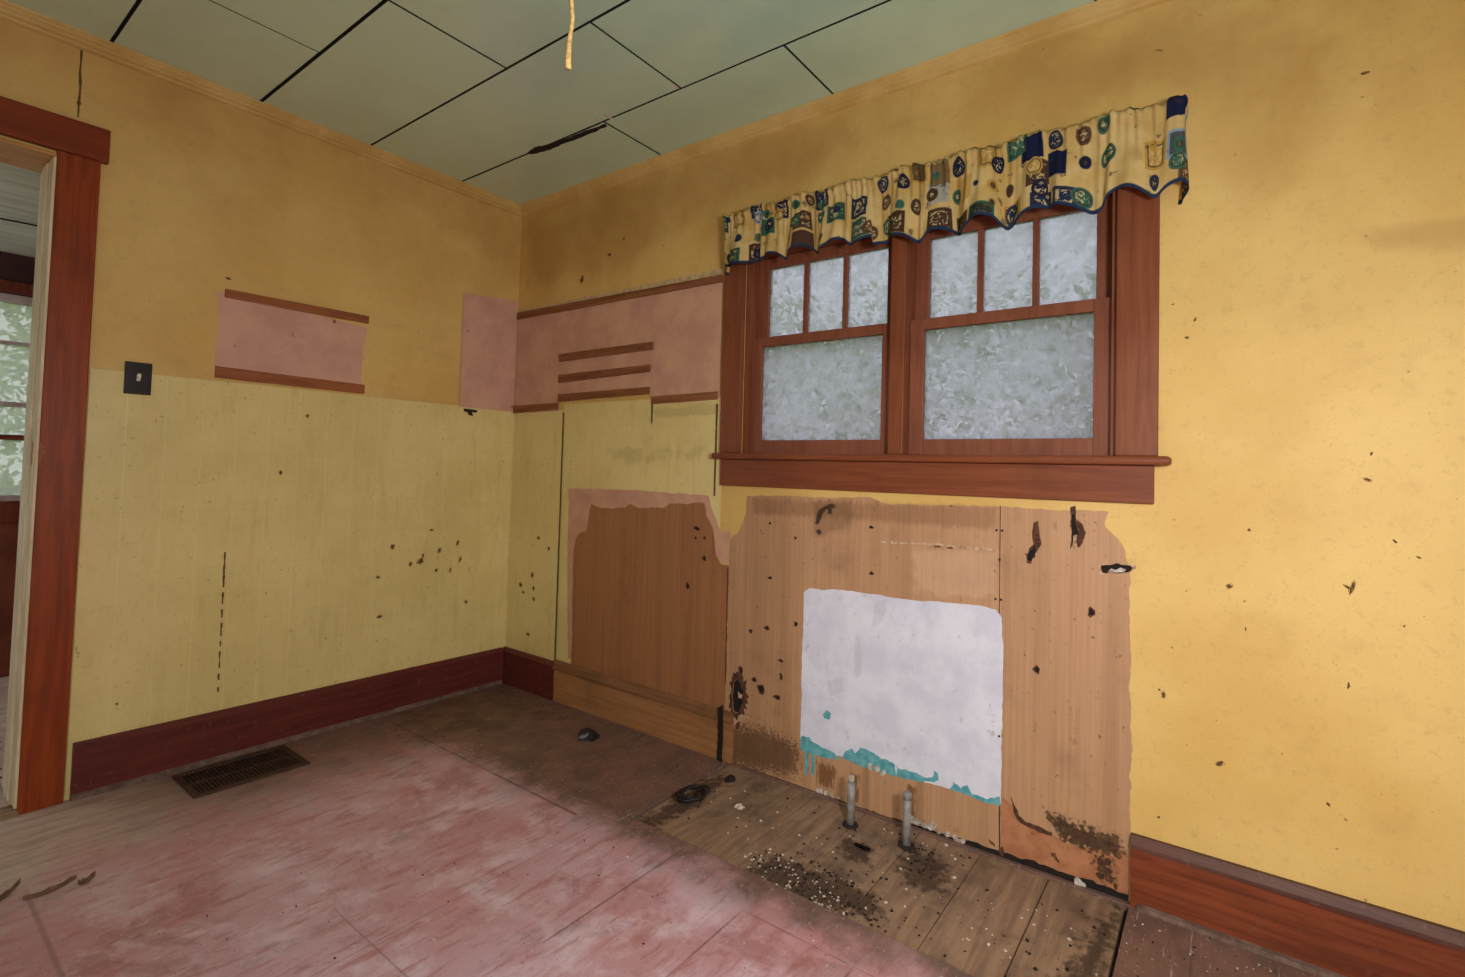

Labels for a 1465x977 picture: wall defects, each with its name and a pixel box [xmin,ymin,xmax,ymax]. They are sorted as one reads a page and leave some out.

crack [76,50,84,117]
peeling [537,488,1136,897]
water stain [1043,807,1127,886]